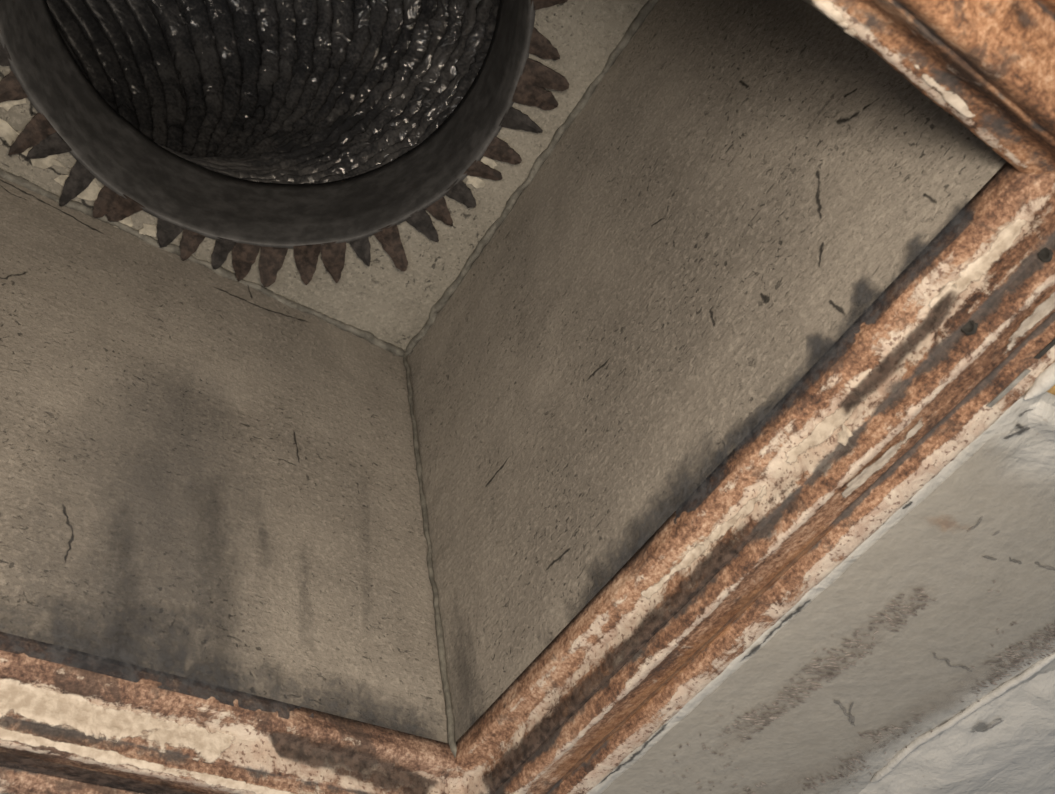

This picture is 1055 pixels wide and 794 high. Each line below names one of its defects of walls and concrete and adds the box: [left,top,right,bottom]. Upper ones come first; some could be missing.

peeling [929,218,1026,309]
water stain [581,208,971,610]
peeling [786,395,867,464]
peeling [842,420,923,498]
corrosion [841,292,956,412]
peeling [1005,292,1055,353]
spalling [1024,362,1055,400]
peeling [641,486,767,599]
water stain [0,621,429,738]
corrosion [483,528,753,794]
peeling [0,679,293,794]